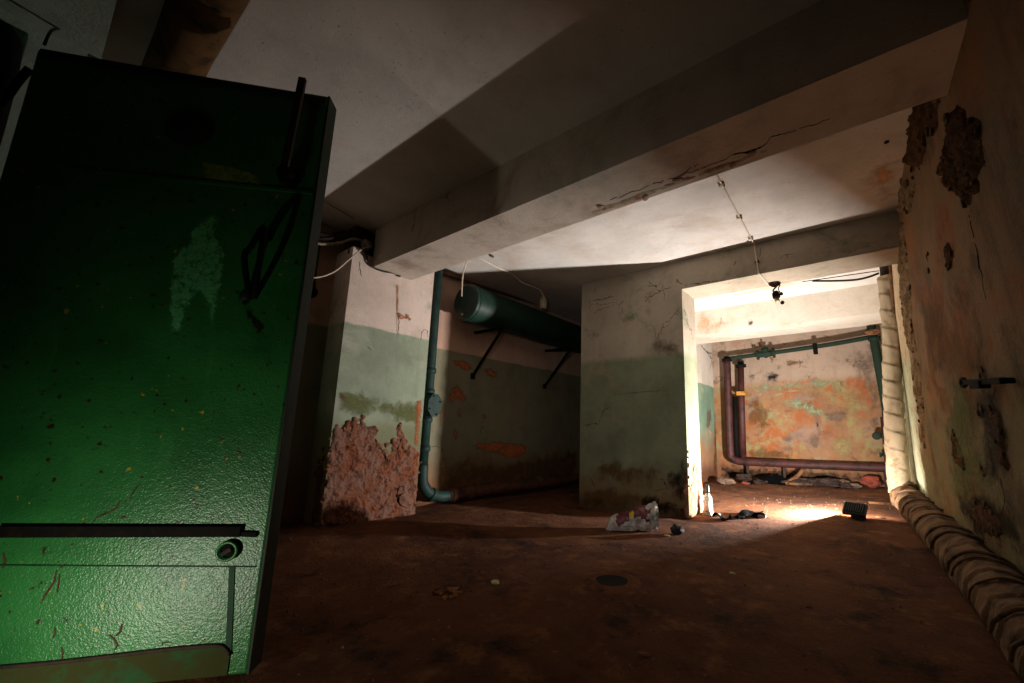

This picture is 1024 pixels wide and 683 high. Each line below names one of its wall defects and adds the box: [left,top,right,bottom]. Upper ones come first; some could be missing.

crack [611,119,829,200]
flaking render [895,98,986,449]
crack [969,216,986,299]
crack [589,278,712,367]
flaking render [317,415,422,528]
damp [584,462,687,517]